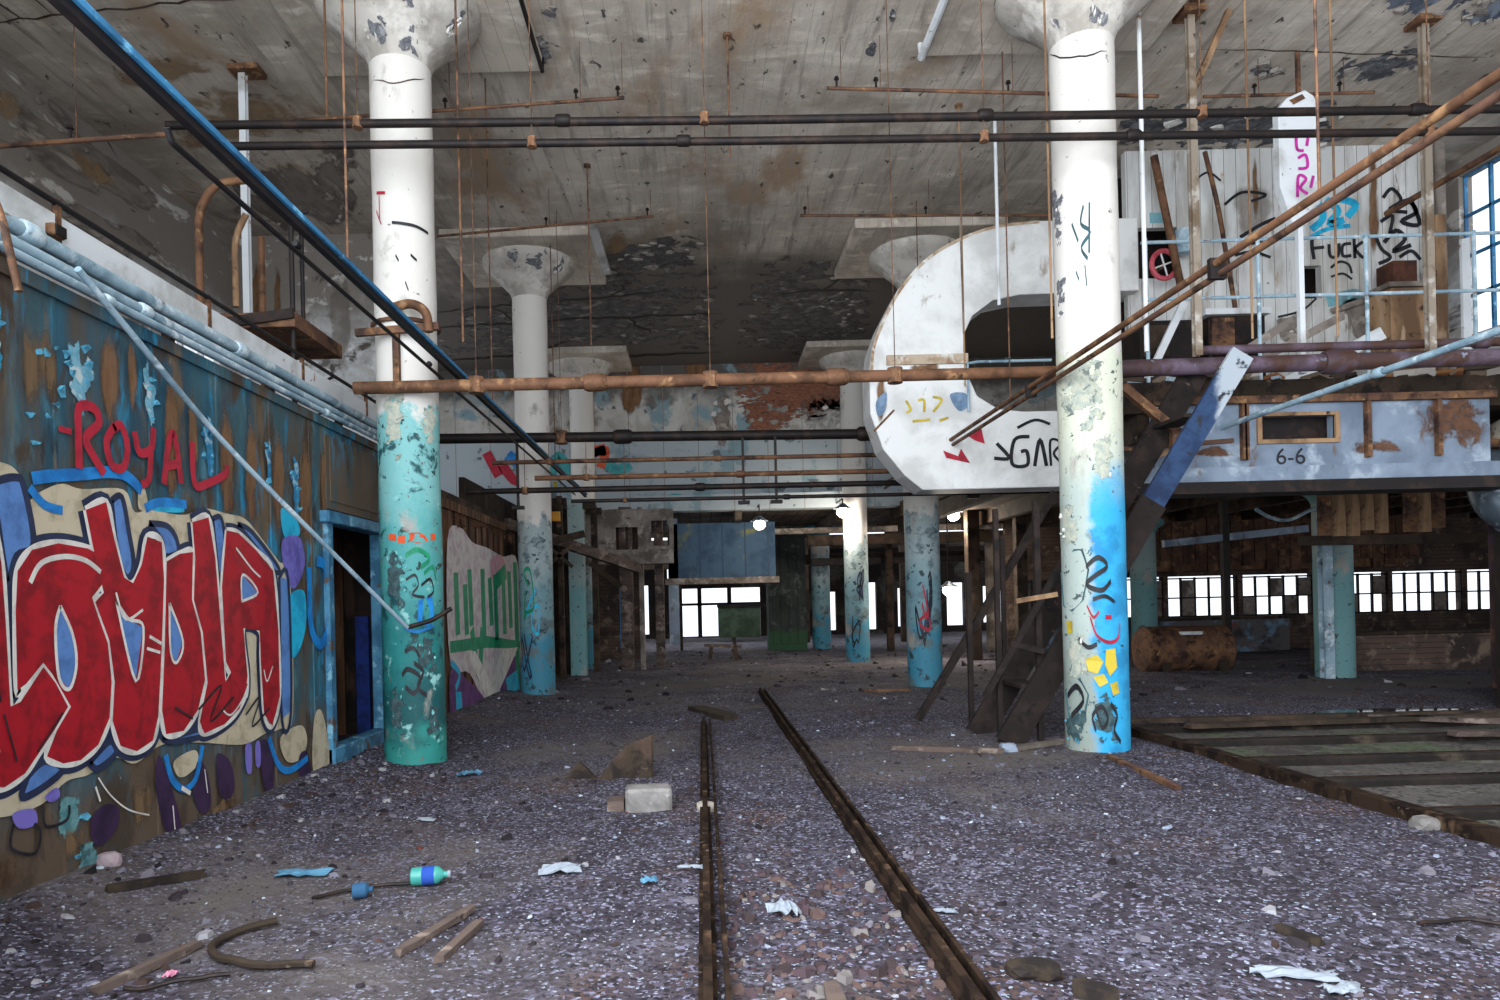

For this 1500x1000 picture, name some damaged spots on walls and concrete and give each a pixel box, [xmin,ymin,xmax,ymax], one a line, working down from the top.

spalling [364,15,418,57]
spalling [446,11,465,37]
peeling [1387,0,1500,27]
peeling [710,256,869,446]
peeling [383,394,436,461]
rust [1356,440,1400,453]
rust [1427,399,1483,447]
peeling [387,549,406,611]
peeling [417,631,437,674]
peeling [427,706,442,739]